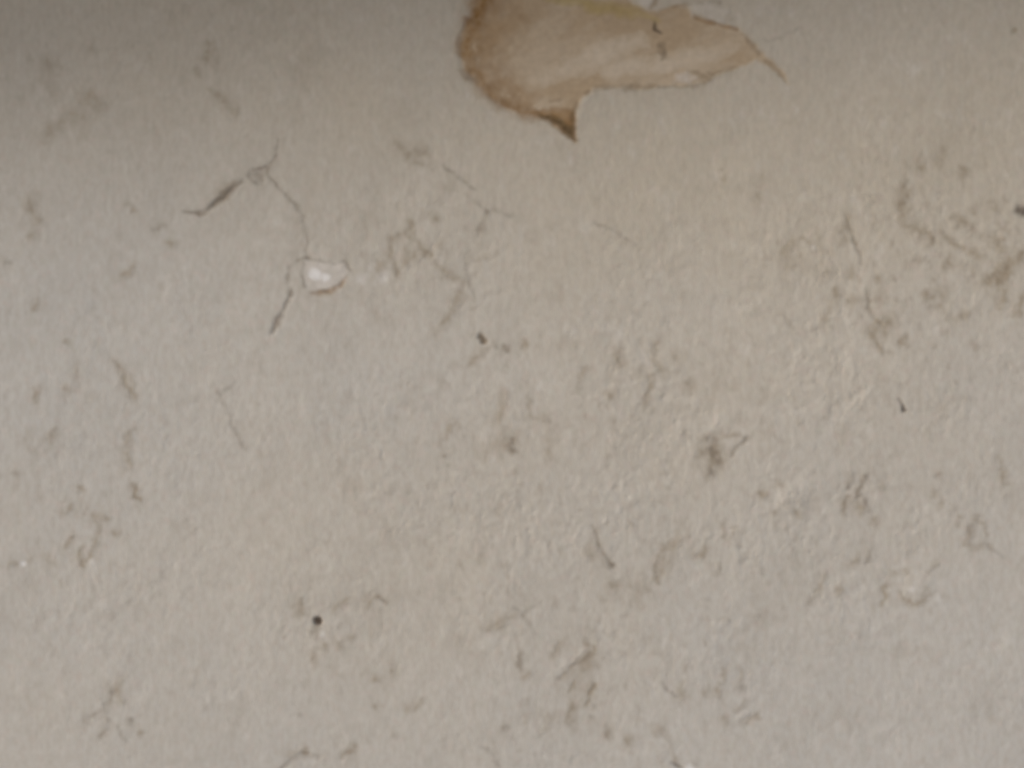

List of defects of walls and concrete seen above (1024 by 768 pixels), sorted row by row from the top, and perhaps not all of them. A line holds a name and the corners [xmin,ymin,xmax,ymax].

spalling [449,0,790,145]
crack [182,137,311,257]
spalling [269,254,393,336]